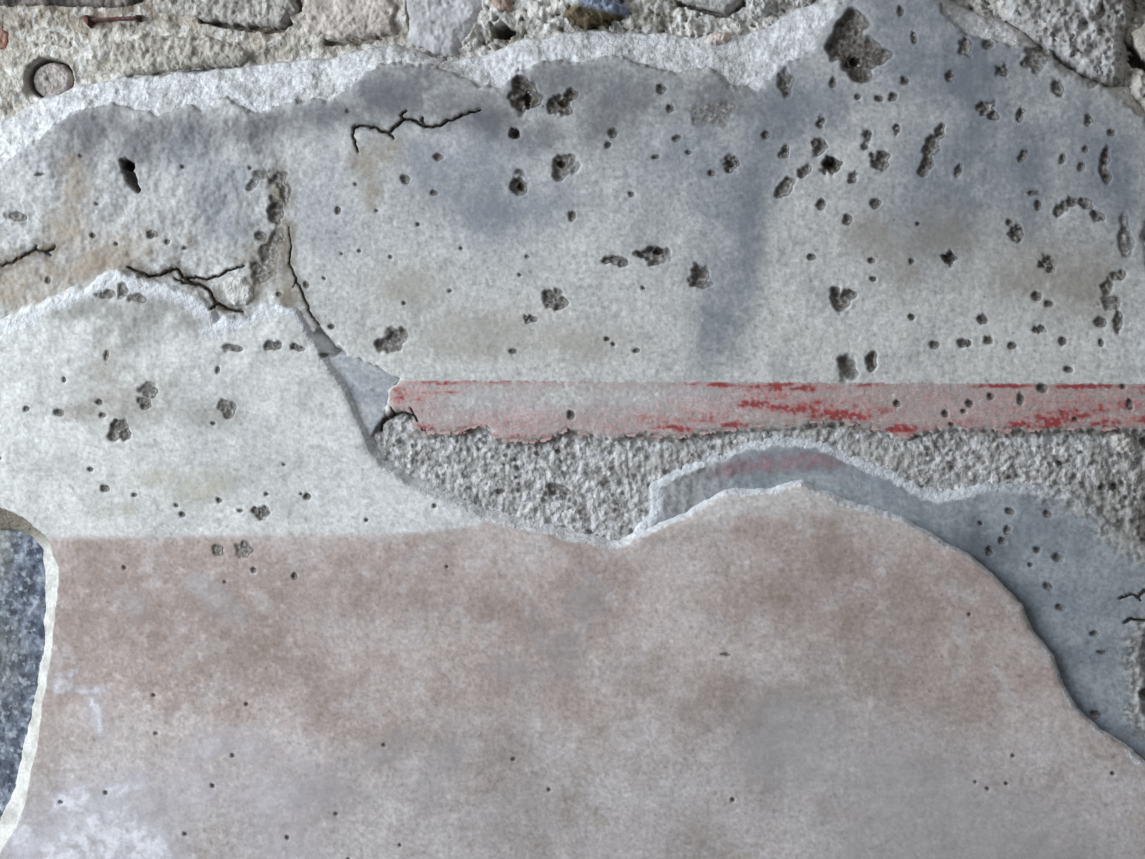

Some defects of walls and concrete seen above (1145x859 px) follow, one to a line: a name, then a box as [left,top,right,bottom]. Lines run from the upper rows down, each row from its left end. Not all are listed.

spalling [827,9,891,99]
spalling [997,47,1050,76]
spalling [509,75,578,115]
spalling [875,77,909,102]
crack [352,109,481,152]
crack [0,244,57,270]
crack [127,264,247,315]
crack [285,227,319,326]
peeling [405,411,593,454]
peeling [942,400,1145,448]
spalling [550,484,570,495]
crack [1121,590,1145,623]